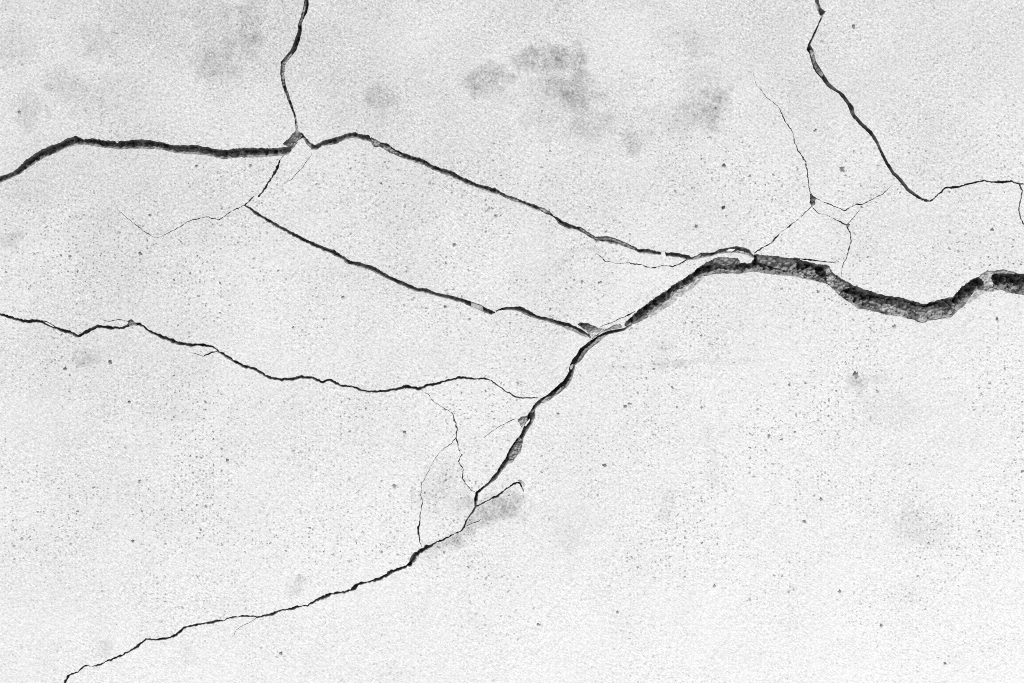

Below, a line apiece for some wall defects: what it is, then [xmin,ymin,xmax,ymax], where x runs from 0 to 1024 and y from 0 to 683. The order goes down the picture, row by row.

crack [0,0,754,268]
crack [759,88,891,217]
crack [807,0,1024,225]
crack [0,196,1024,683]